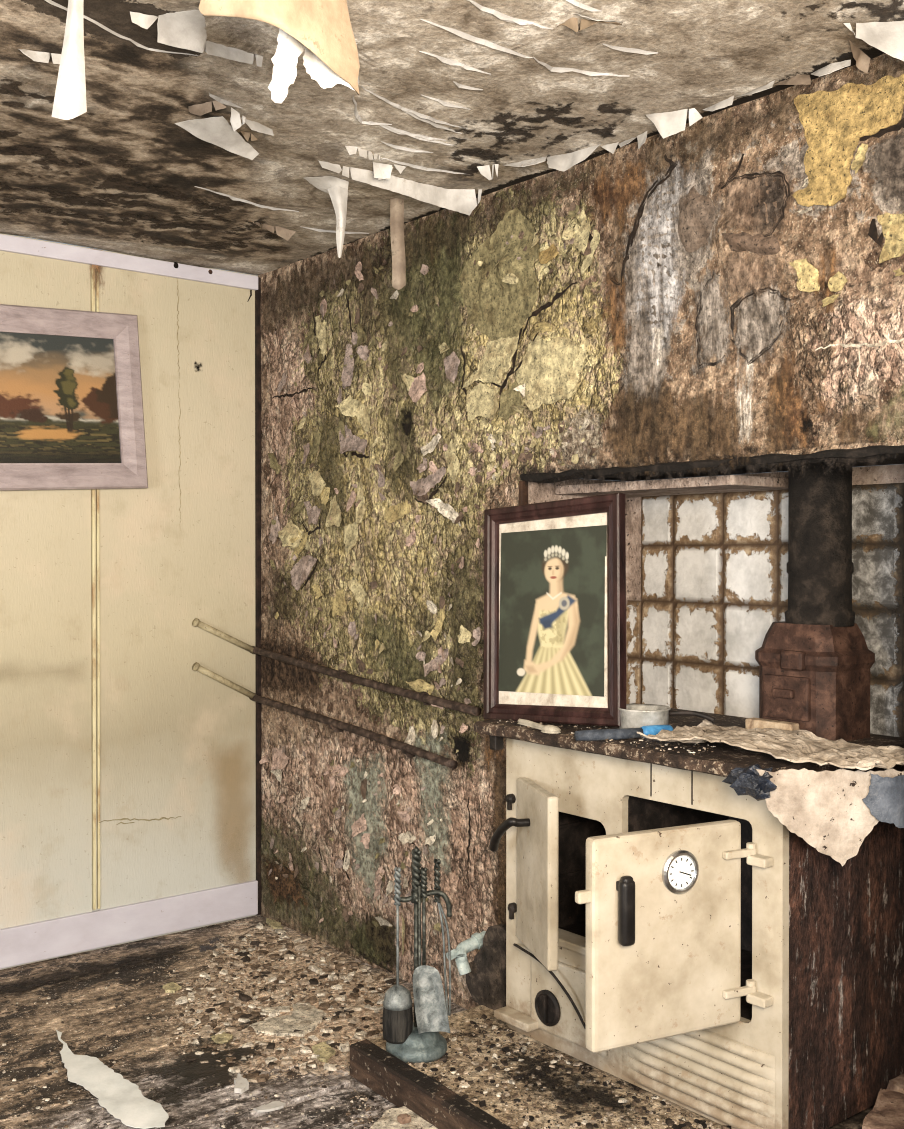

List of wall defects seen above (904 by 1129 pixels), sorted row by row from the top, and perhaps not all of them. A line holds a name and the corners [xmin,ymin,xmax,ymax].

mould [0,77,55,108]
mould [0,130,280,257]
crack [461,154,677,419]
water stain [652,326,663,365]
spalling [619,74,904,402]